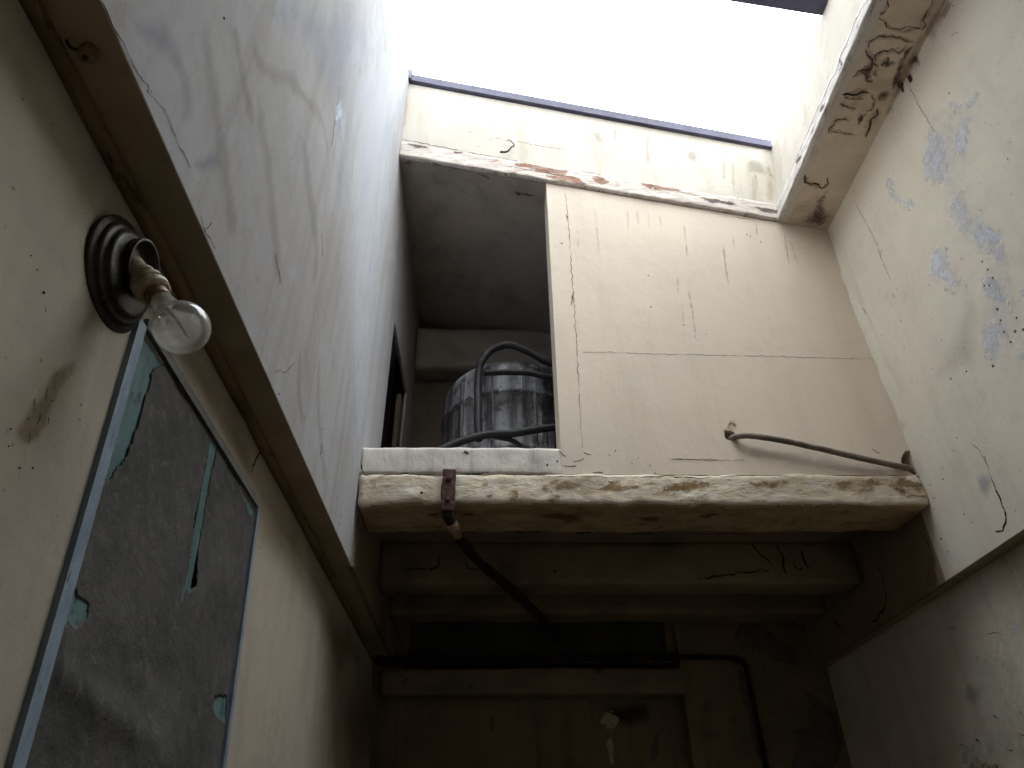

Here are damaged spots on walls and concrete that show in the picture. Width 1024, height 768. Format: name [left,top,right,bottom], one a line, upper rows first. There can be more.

crack [788,0,932,189]
peeling [515,162,608,189]
crack [361,132,857,479]
crack [971,443,1007,532]
crack [689,533,810,579]